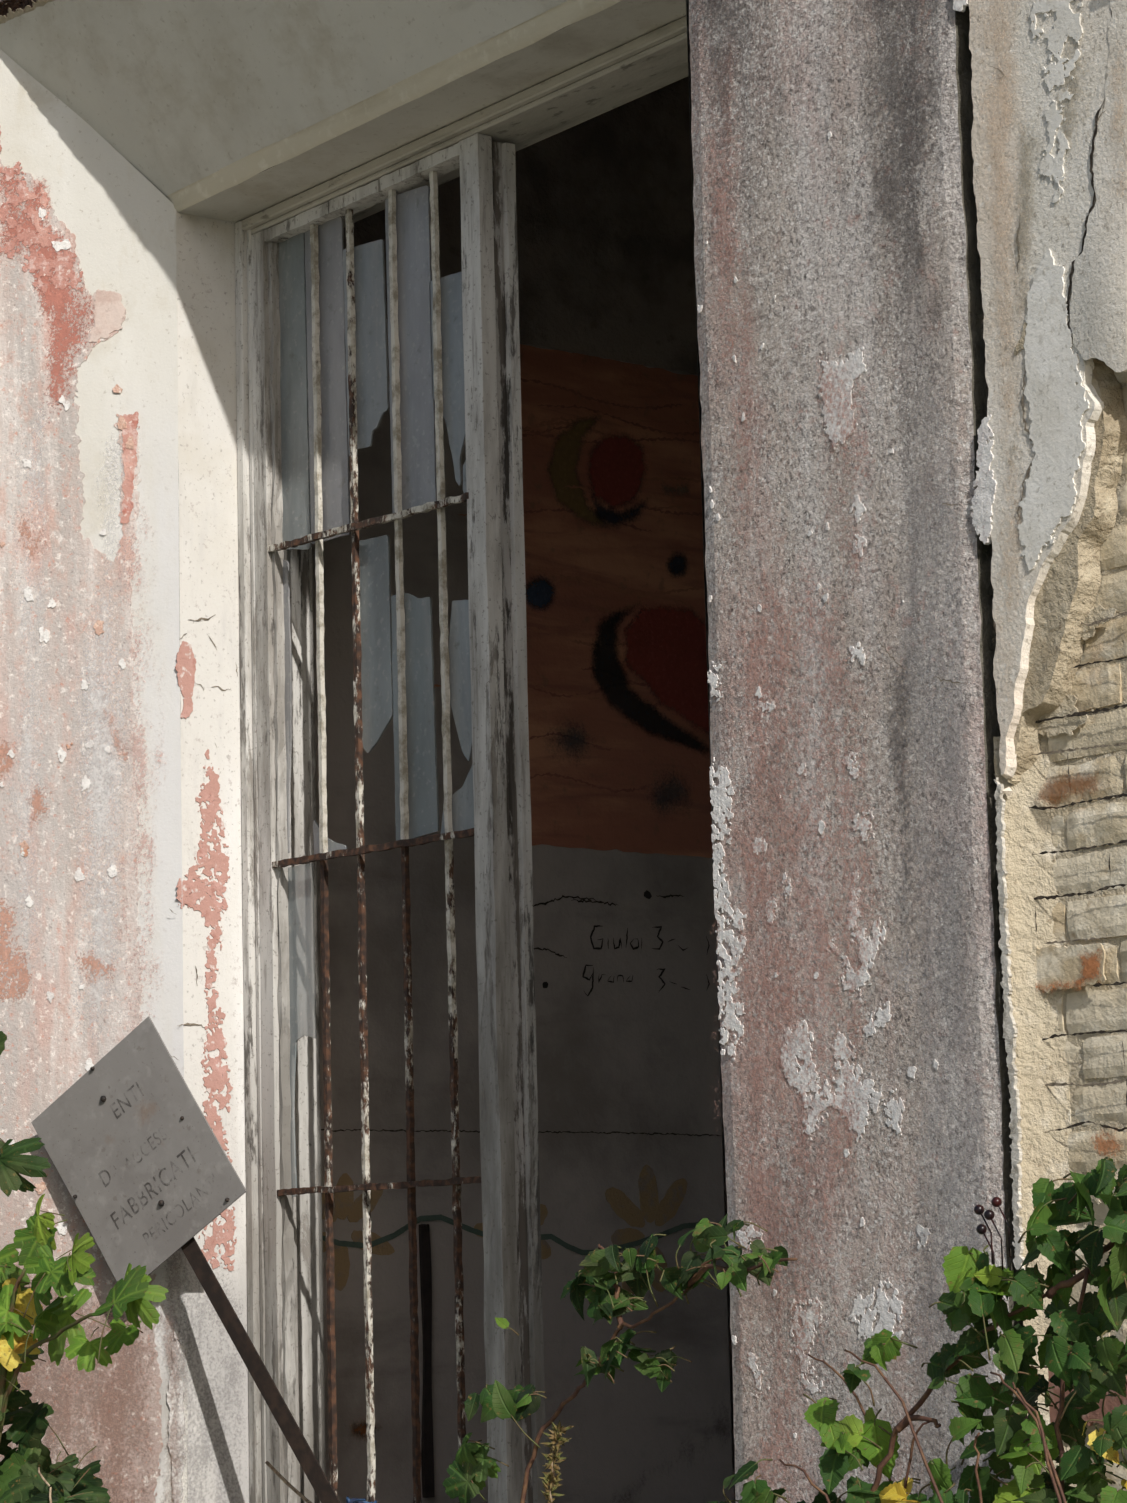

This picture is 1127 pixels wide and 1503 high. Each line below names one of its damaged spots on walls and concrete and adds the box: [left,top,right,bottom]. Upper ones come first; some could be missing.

peeling [1030,0,1083,203]
crack [1063,101,1105,339]
flaking render [970,414,997,545]
peeling [1014,249,1090,571]
peeling [175,641,196,719]
peeling [0,131,164,1503]
peeling [709,757,735,914]
peeling [176,749,233,1163]
peeling [780,1001,939,1158]
flaking render [994,774,1026,1270]
spalling [1035,943,1107,993]
peeling [198,1206,237,1271]